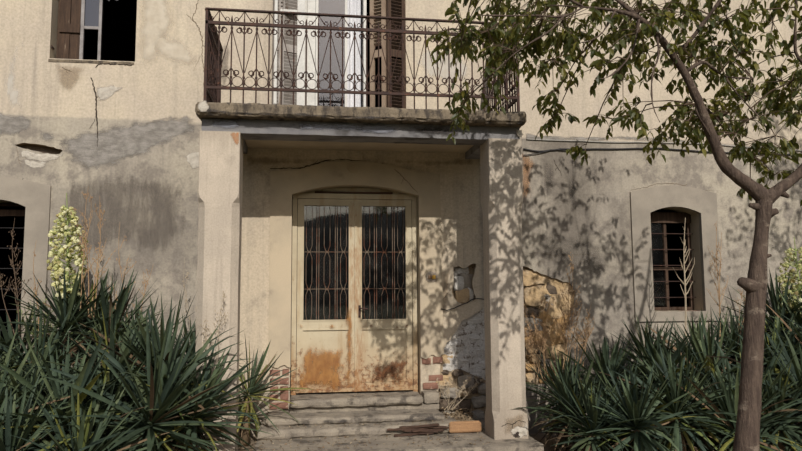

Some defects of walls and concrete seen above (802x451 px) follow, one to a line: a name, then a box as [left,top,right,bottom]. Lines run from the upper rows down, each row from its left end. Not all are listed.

flaking render [18,116,194,168]
crack [270,159,362,169]
spalling [452,264,474,304]
rust [300,311,353,389]
rust [367,360,407,384]